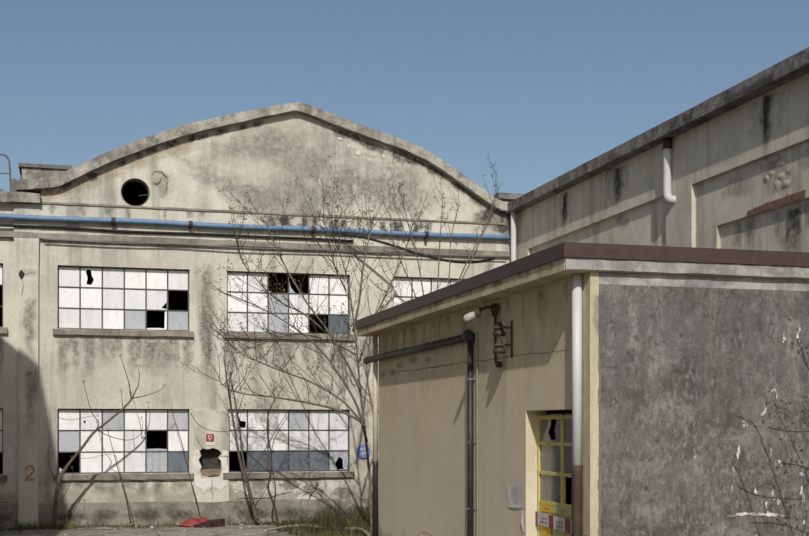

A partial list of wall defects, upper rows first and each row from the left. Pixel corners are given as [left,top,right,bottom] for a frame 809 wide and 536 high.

water stain [752,96,781,128]
water stain [777,209,809,242]
crack [383,350,567,373]
flaking render [193,449,353,499]